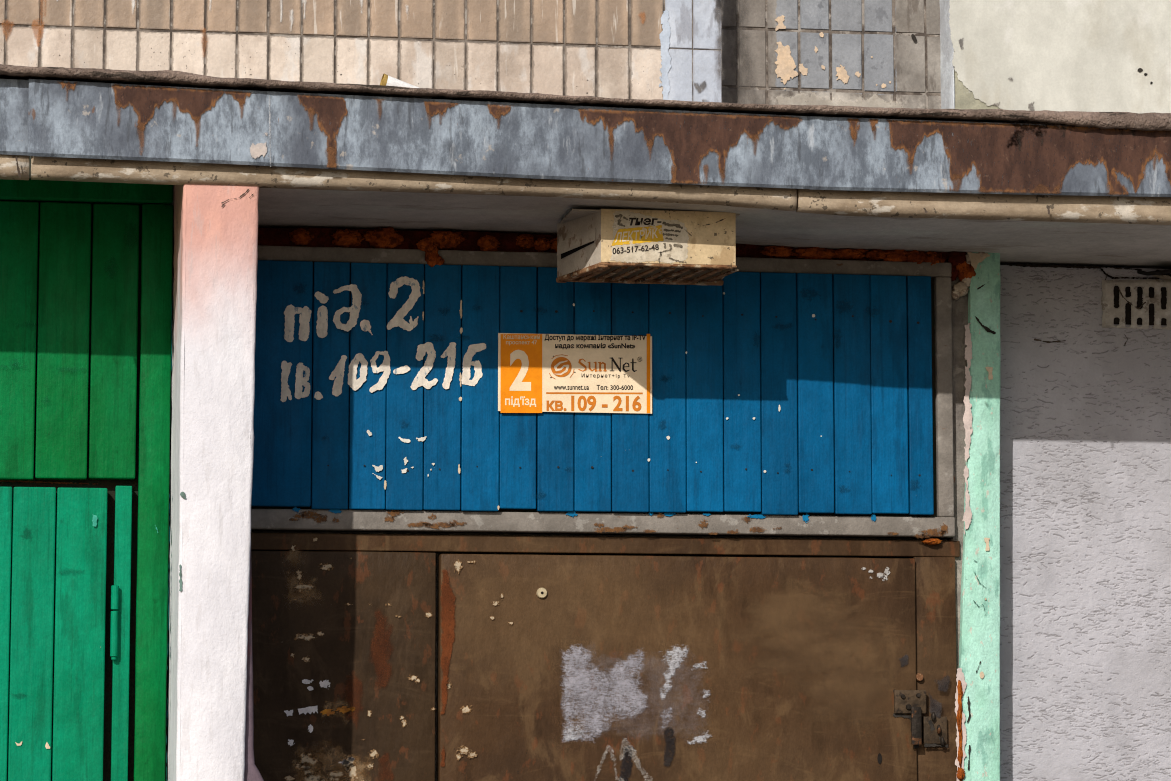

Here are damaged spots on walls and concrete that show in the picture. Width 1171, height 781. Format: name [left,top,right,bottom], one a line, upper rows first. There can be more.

peeling [775,15,861,89]
corrosion [112,84,251,155]
corrosion [298,95,348,168]
corrosion [578,109,802,183]
corrosion [848,118,1171,195]
peeling [962,316,996,534]
peeling [955,668,967,781]
peeling [294,746,370,781]